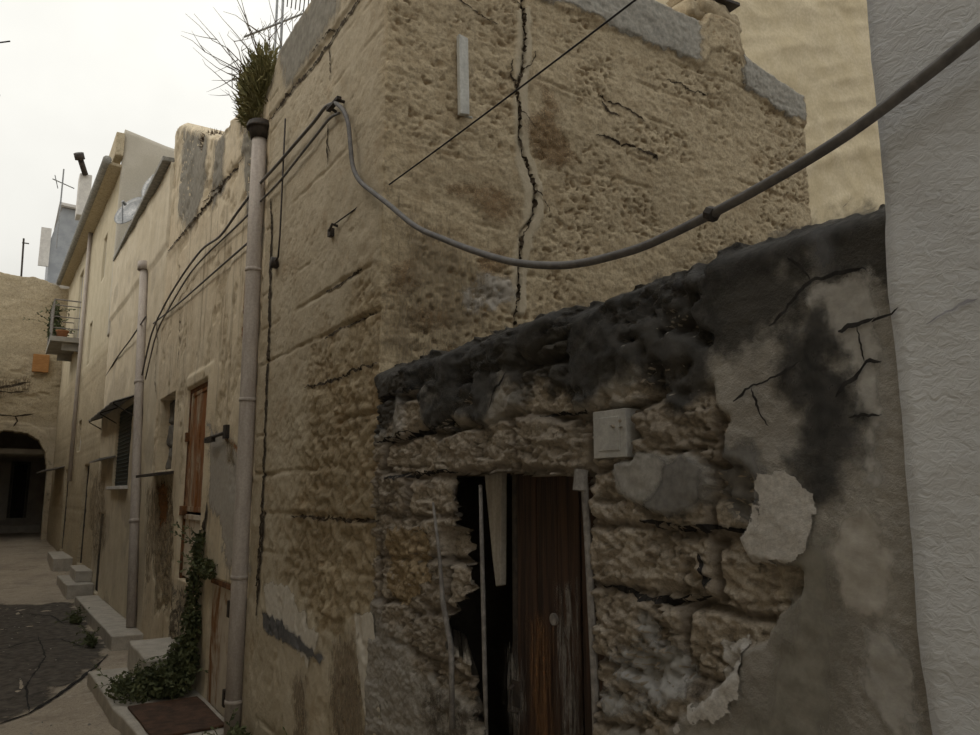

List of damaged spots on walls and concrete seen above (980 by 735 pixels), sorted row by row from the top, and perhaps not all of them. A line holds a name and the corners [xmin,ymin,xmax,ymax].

crack [510,0,550,328]
leakage [382,202,879,433]
crack [769,257,866,326]
crack [733,361,802,426]
leakage [777,308,868,505]
leakage [718,440,765,522]
peeling [740,469,817,567]
peeling [673,634,752,734]